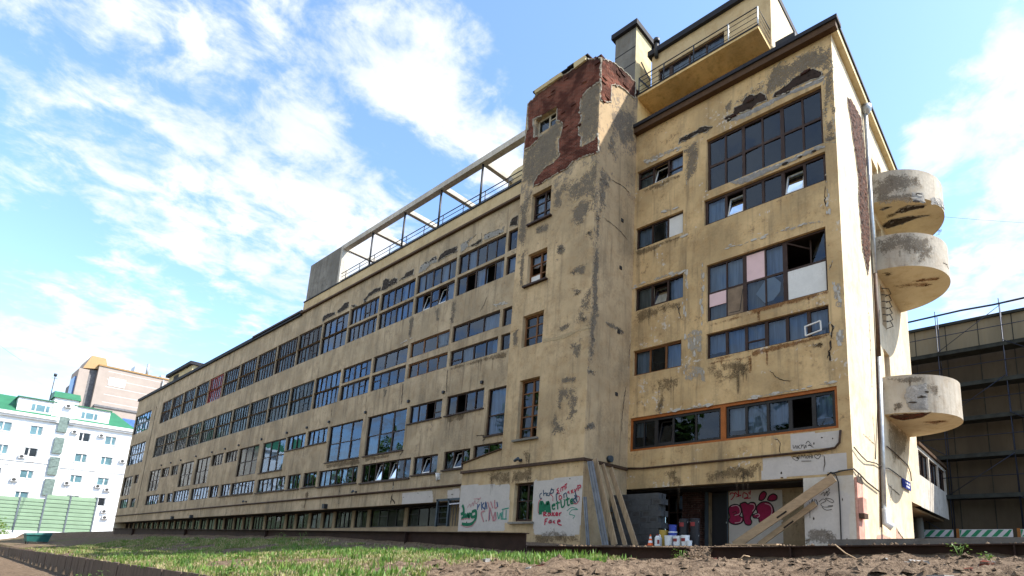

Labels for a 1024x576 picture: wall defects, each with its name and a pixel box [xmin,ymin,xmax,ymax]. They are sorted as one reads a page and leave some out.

spalling [322,57,637,376]
peeling [632,262,705,381]
spalling [643,46,945,275]
spalling [889,376,940,421]